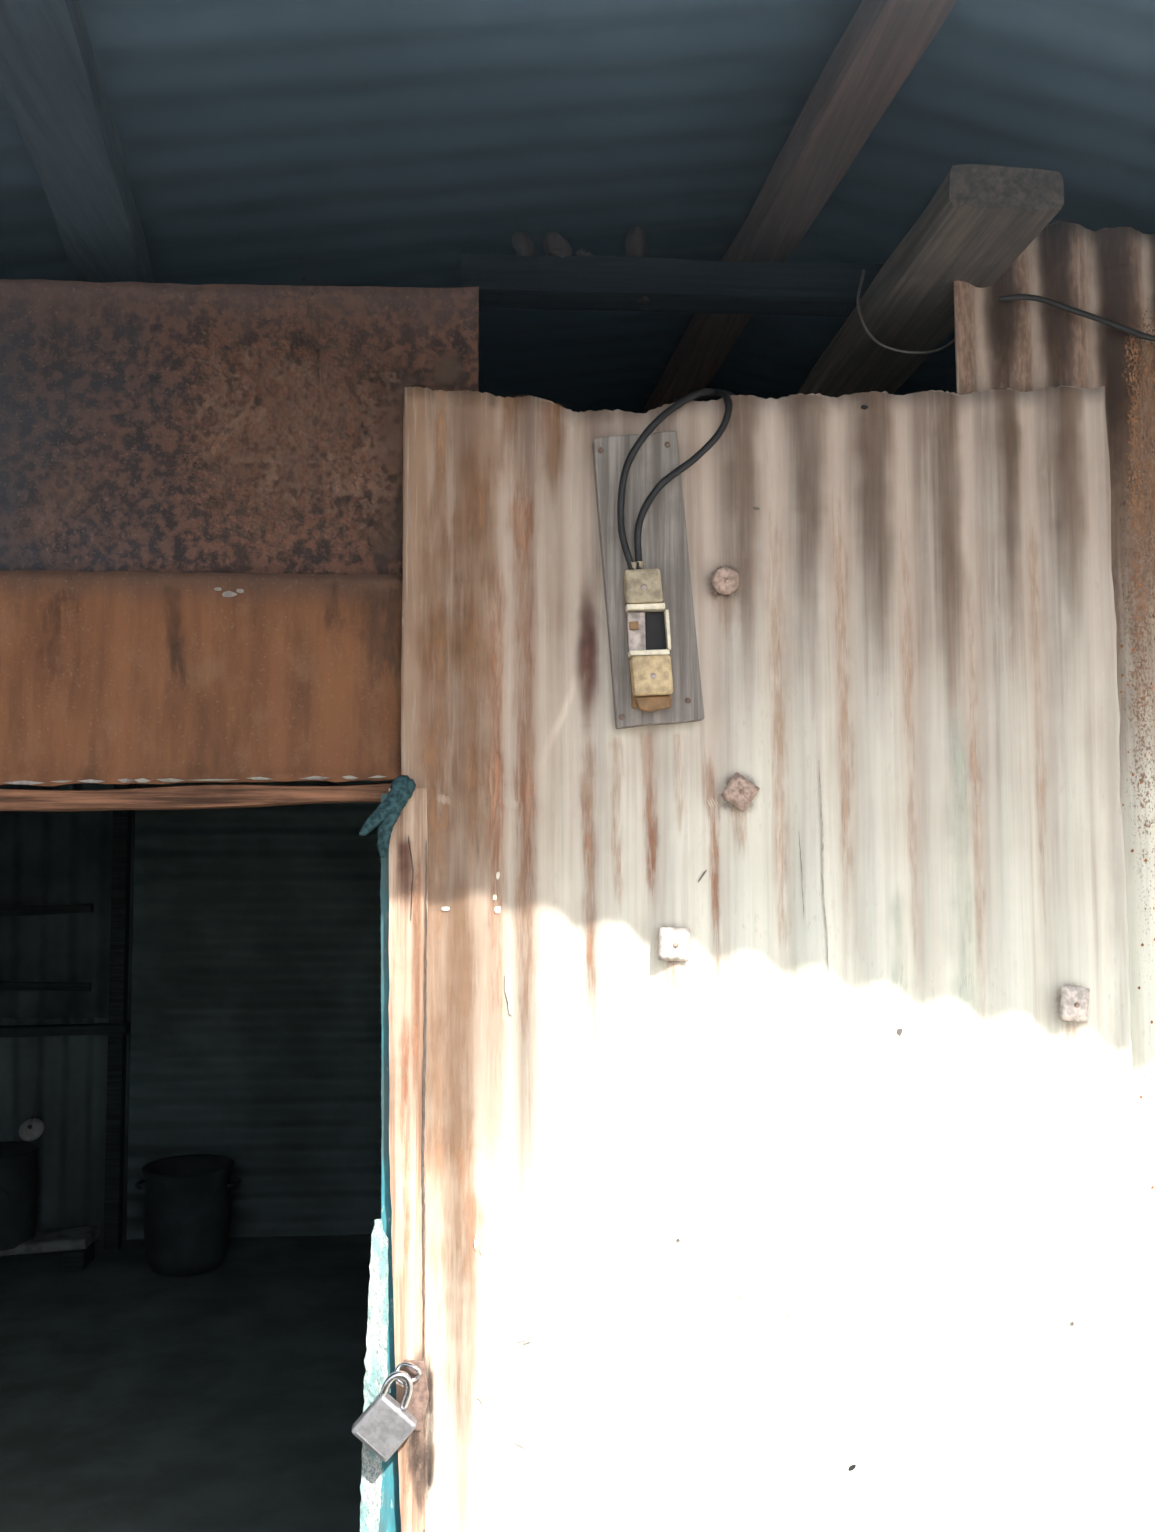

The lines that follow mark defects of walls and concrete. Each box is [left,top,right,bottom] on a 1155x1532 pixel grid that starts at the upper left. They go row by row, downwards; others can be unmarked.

corrosion [189,347,404,525]
corrosion [513,493,532,561]
corrosion [214,587,244,597]
corrosion [1120,317,1155,862]
corrosion [579,605,596,703]
corrosion [421,598,534,891]
corrosion [400,843,418,885]
corrosion [583,797,593,875]
corrosion [646,789,657,883]
corrosion [709,805,719,921]
corrosion [401,1012,476,1278]